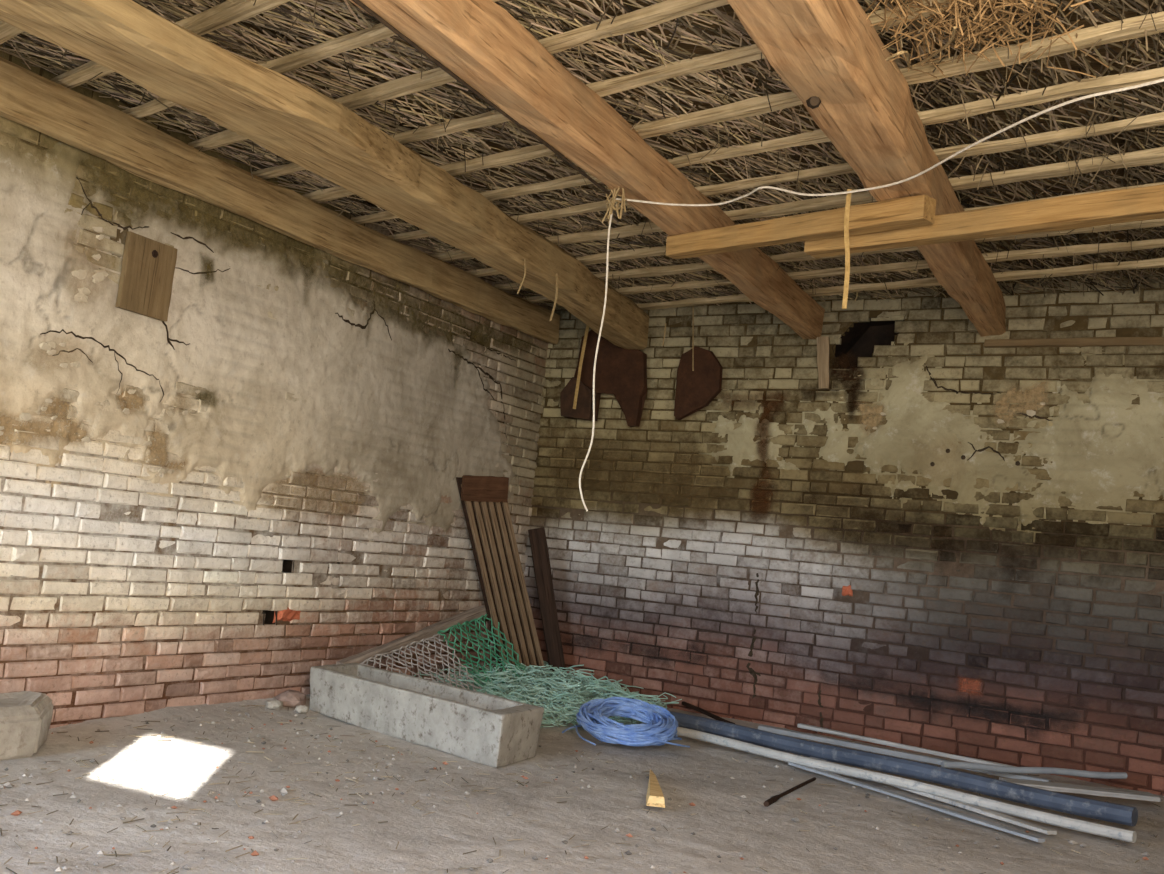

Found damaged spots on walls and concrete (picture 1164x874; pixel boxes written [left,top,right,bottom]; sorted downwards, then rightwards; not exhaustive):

peeling [71,254,109,302]
crack [162,321,190,350]
crack [40,329,164,402]
flaking render [0,398,91,445]
flaking render [118,389,144,414]
flaking render [195,390,215,405]
flaking render [145,426,186,474]